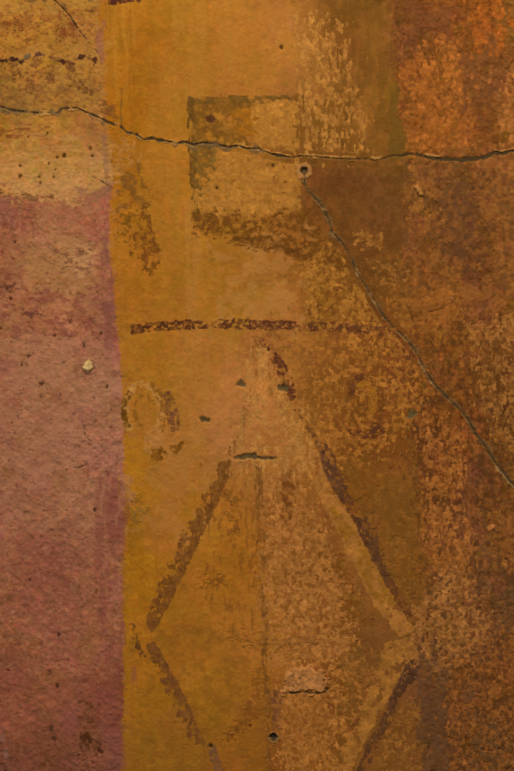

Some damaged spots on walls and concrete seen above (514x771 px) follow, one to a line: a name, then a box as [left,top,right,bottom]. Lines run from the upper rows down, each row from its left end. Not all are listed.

crack [54,0,101,59]
crack [0,89,514,489]